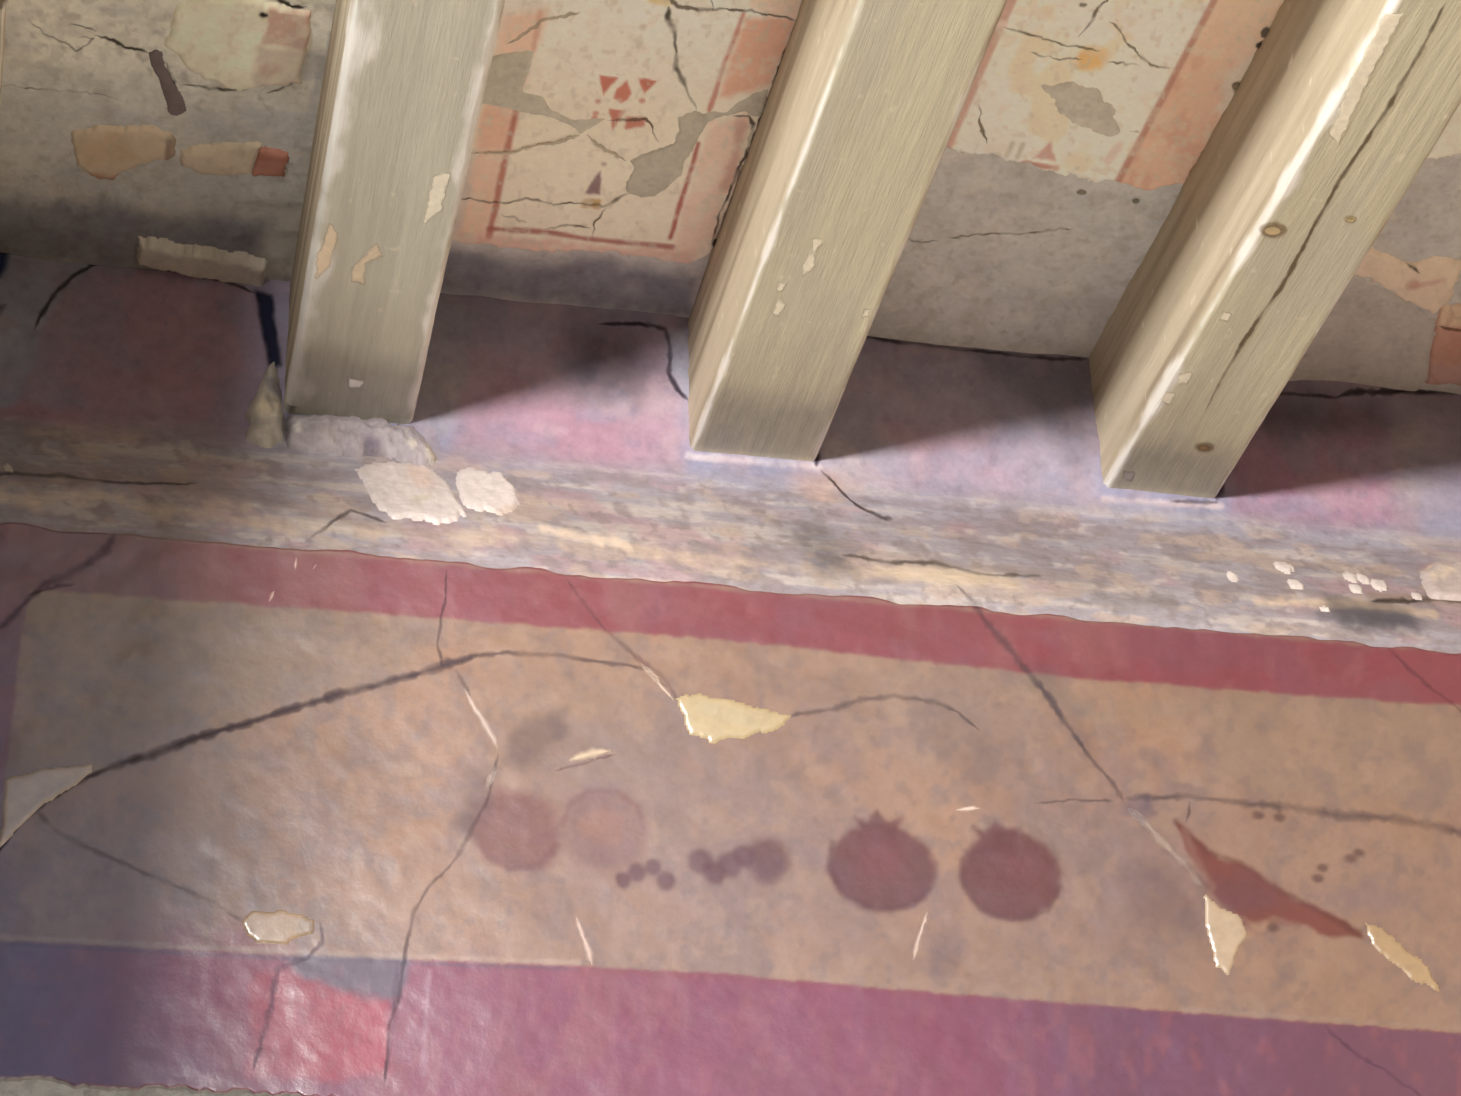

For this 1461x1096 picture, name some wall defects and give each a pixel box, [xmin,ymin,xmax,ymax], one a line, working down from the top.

crack [74,24,146,52]
crack [278,0,303,9]
crack [665,0,792,85]
crack [474,118,654,160]
crack [602,322,687,399]
crack [55,657,497,798]
crack [571,750,611,760]
spalling [676,693,791,743]
spalling [0,764,92,847]
crack [577,920,592,963]
spalling [1203,894,1247,975]
spalling [1365,922,1441,992]